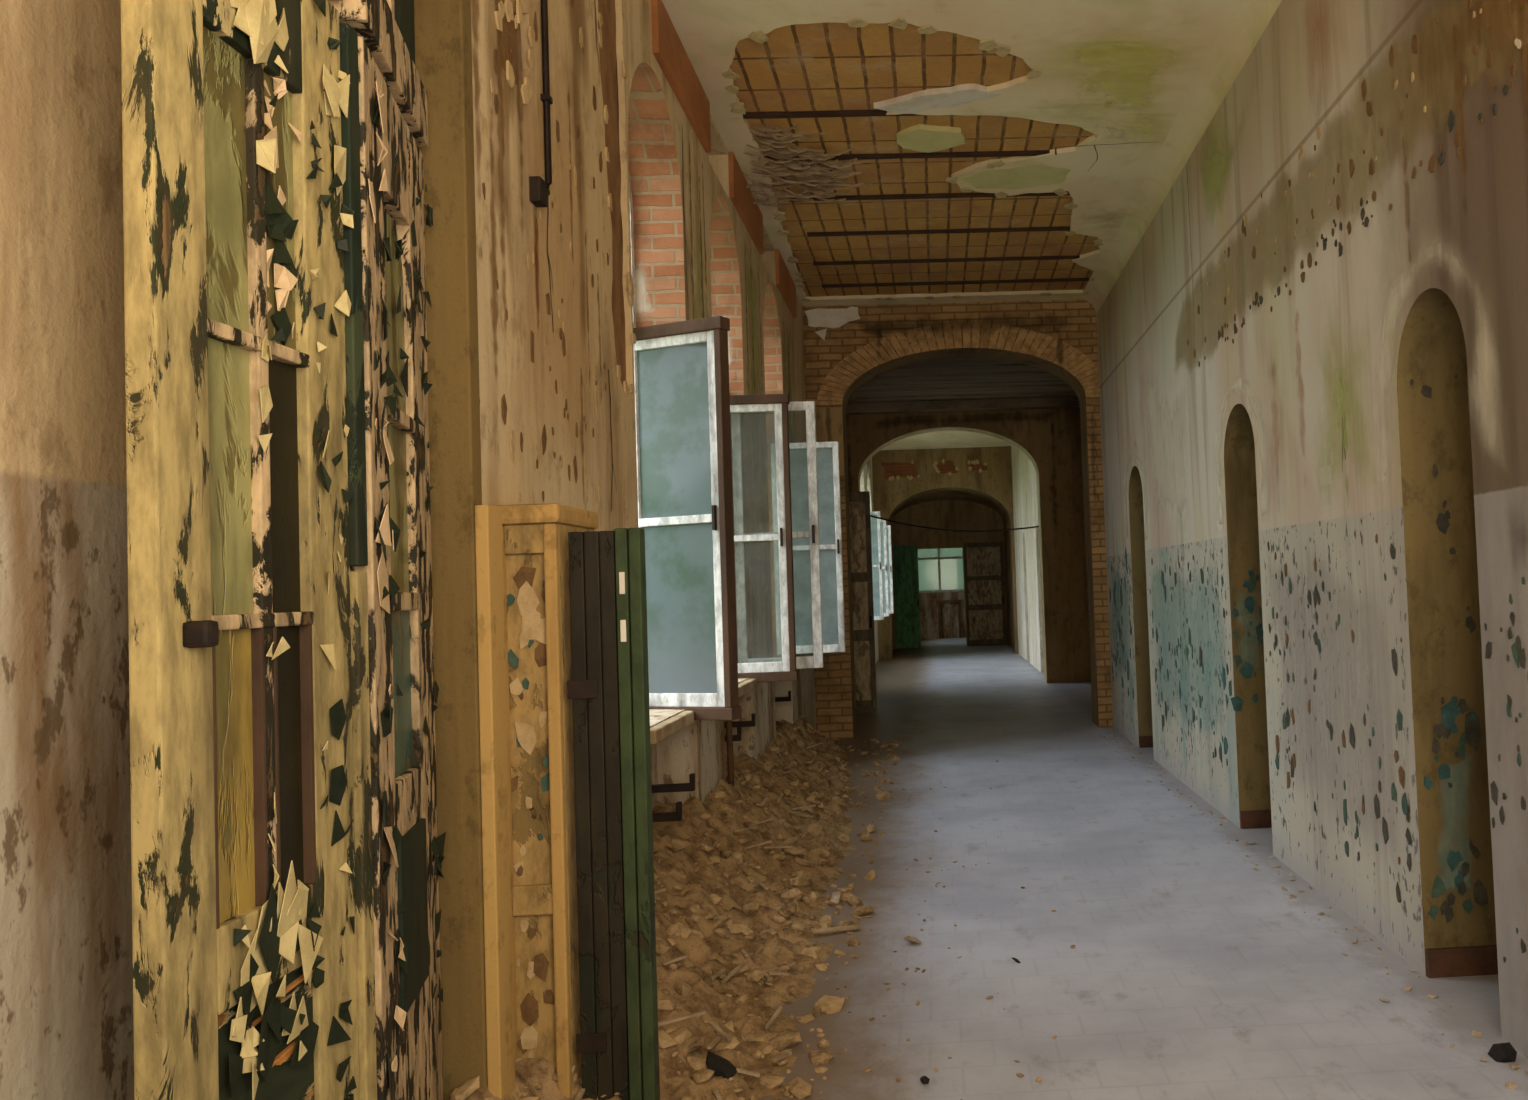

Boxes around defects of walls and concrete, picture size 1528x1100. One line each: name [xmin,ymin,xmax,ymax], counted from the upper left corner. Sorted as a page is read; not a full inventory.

peeling [230,0,433,373]
damp [472,0,480,108]
damp [477,0,523,351]
damp [568,0,584,224]
flaking render [722,18,1103,302]
peeling [257,385,273,452]
peeling [374,272,433,614]
peeling [266,637,290,660]
peeling [229,792,357,1100]
peeling [320,765,354,846]
peeling [507,567,547,700]
peeling [1150,542,1411,902]